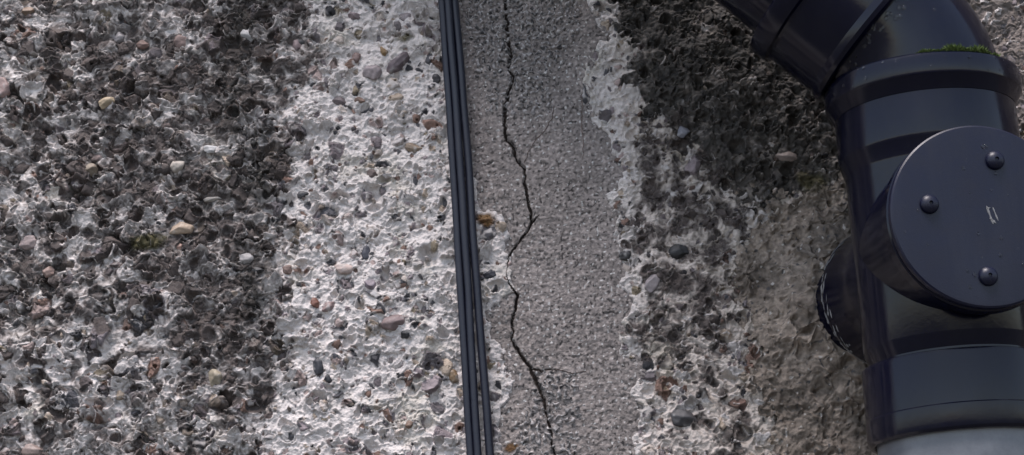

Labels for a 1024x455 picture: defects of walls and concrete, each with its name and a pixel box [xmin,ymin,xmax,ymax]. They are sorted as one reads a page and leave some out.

crack [502,1,586,455]